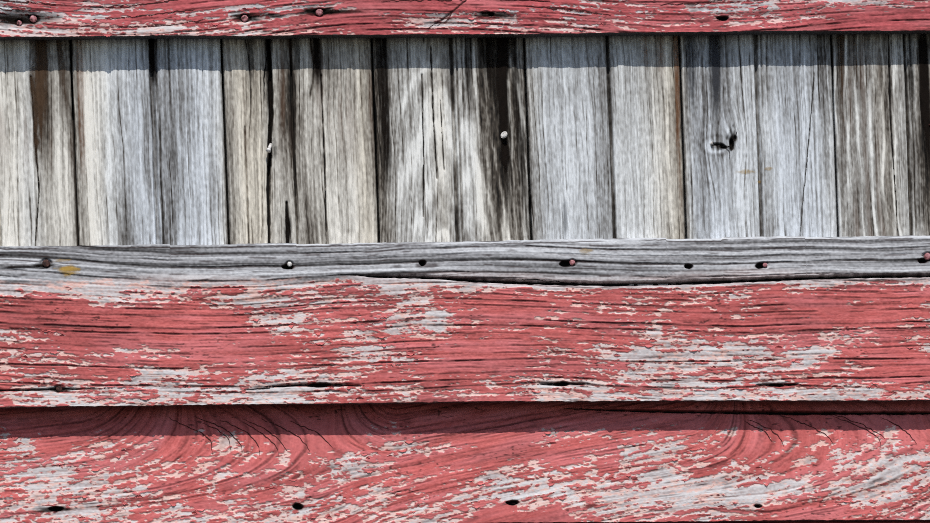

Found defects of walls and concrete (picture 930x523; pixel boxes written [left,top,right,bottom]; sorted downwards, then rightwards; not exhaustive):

crack [31,92,40,244]
crack [263,51,289,238]
crack [320,82,328,231]
crack [422,58,444,212]
crack [889,65,899,233]
peeling [0,427,153,521]
peeling [3,365,249,407]
peeling [247,304,462,367]
peeling [405,436,795,518]
peeling [519,335,828,401]
crack [564,408,930,446]
peeling [633,381,930,401]